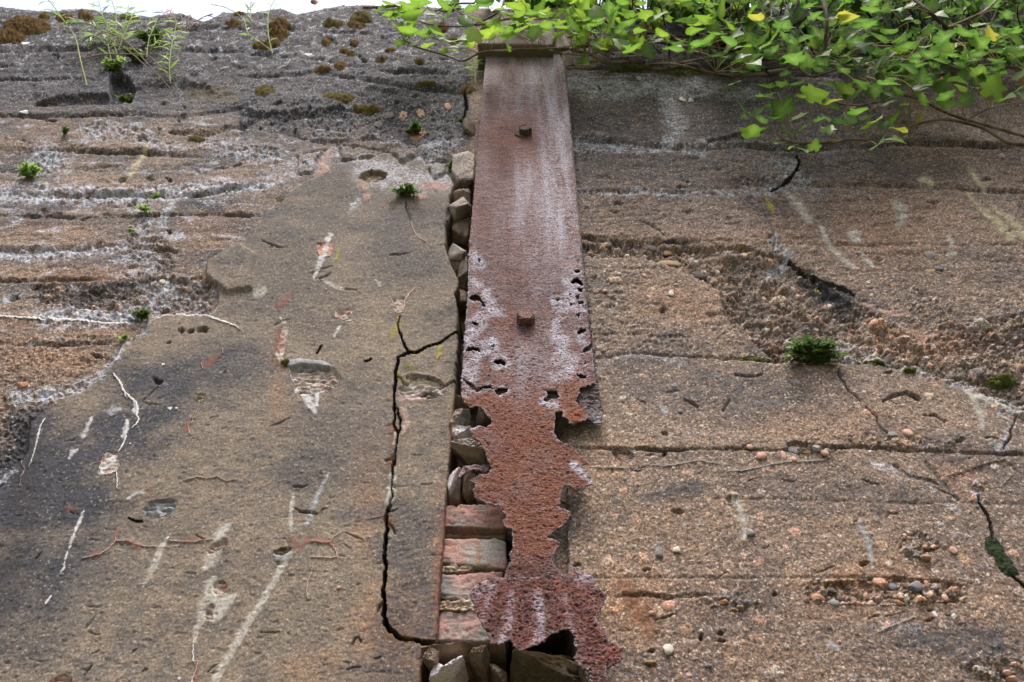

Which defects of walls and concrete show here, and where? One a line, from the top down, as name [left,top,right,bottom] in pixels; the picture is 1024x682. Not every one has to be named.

crack [742,154,856,297]
crack [363,287,461,646]
rust [450,430,490,478]
crack [894,462,994,539]
spalling [420,641,508,682]